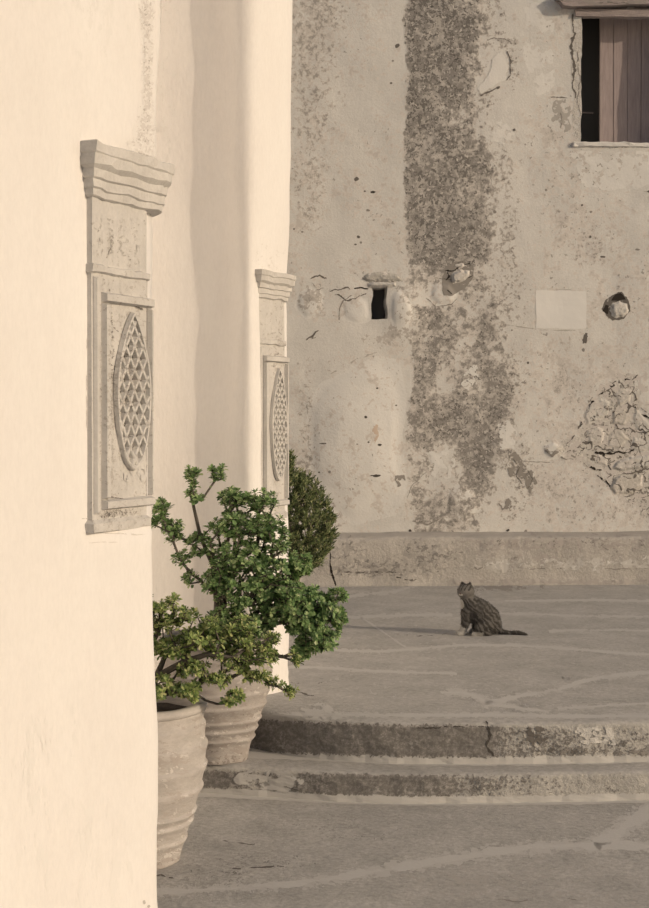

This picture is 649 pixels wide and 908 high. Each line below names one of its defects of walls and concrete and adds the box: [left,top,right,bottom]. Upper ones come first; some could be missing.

flaking render [477,51,508,94]
crack [551,14,581,128]
crack [310,274,393,320]
spalling [442,261,474,296]
flaking render [602,292,630,321]
crack [513,375,649,515]
crack [330,548,417,586]
leakage [250,585,649,759]
crack [416,721,494,757]